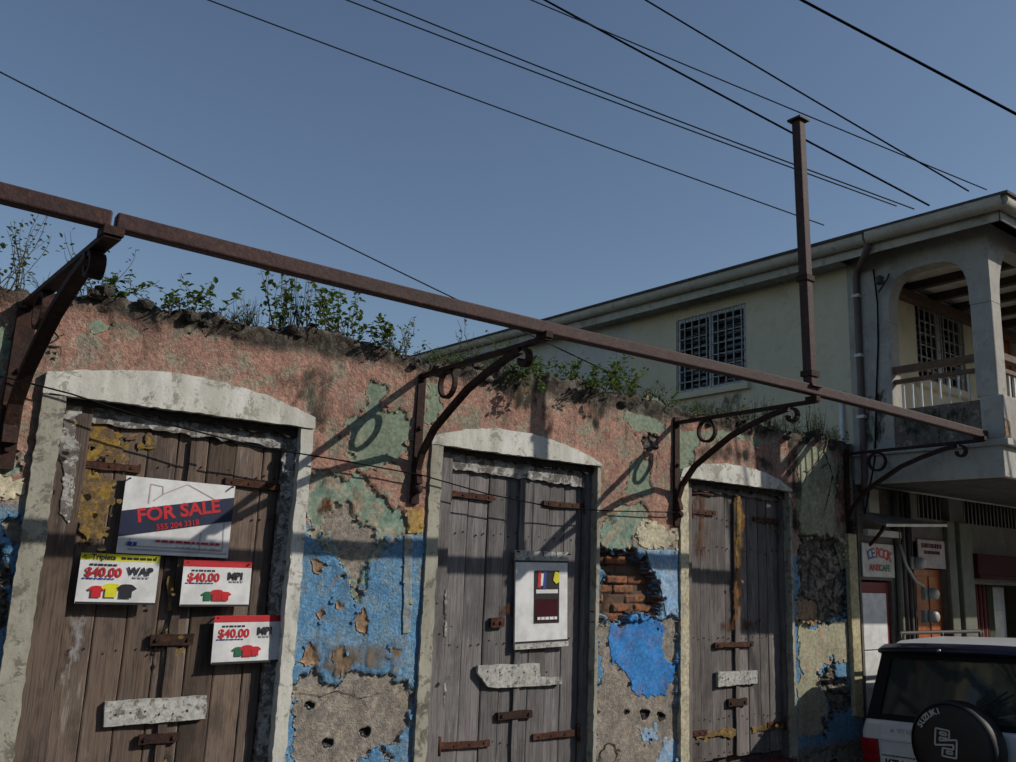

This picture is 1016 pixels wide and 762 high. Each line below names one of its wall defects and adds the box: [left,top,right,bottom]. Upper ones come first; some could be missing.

spalling [0,513,22,631]
peeling [58,405,157,552]
peeling [280,437,300,511]
peeling [307,377,444,635]
spalling [589,389,680,762]
rust [724,499,761,631]
spalling [796,529,848,626]
spalling [285,641,416,762]
spalling [817,656,851,739]